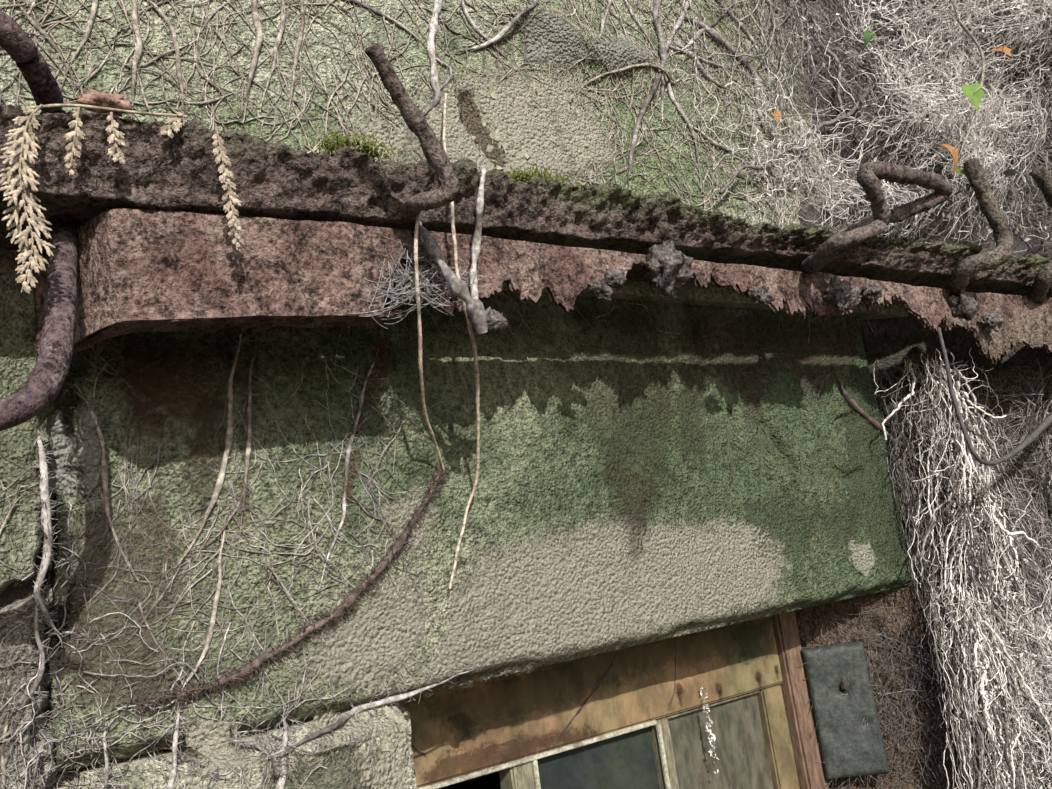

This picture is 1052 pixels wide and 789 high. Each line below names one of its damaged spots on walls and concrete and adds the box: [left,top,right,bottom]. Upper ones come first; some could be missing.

peeling [848,540,877,576]